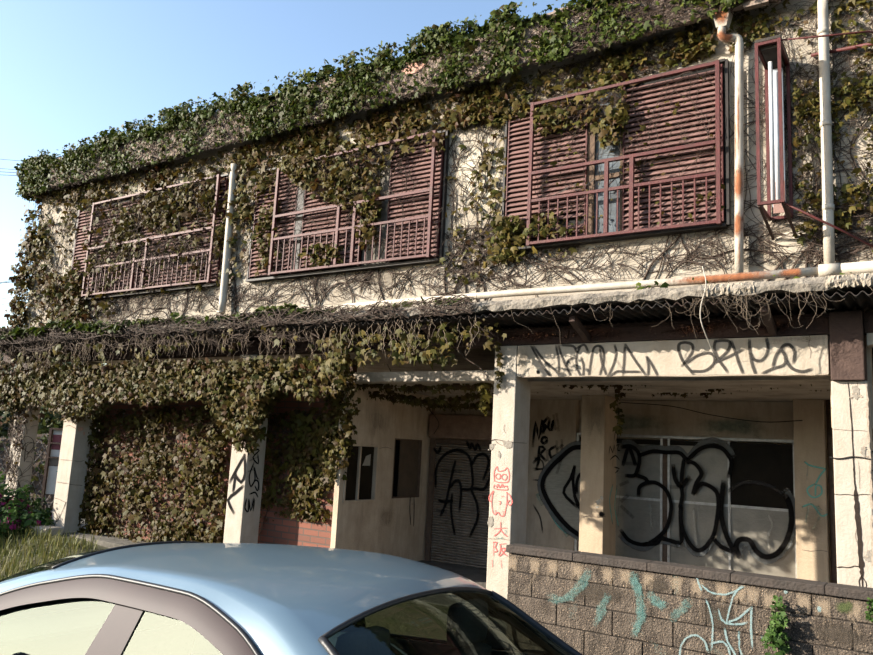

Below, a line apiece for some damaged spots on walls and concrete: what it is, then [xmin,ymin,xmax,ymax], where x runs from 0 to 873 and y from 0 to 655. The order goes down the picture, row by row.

corrosion [734,98,743,196]
corrosion [679,272,759,284]
corrosion [734,213,743,261]
crack [805,383,870,587]